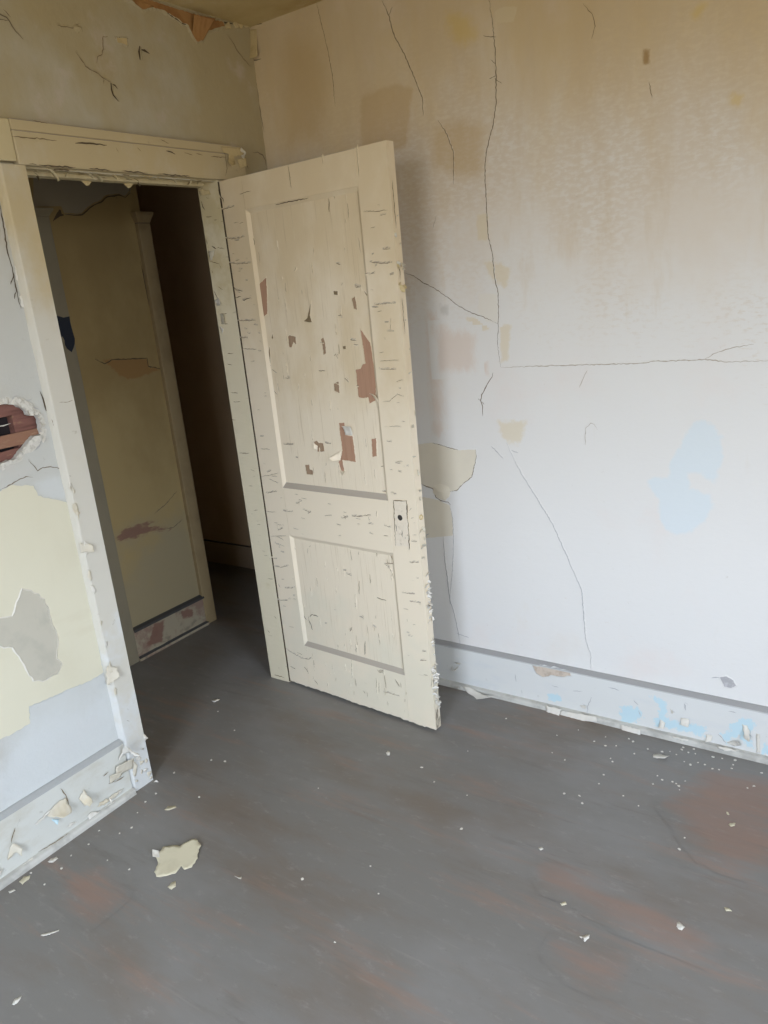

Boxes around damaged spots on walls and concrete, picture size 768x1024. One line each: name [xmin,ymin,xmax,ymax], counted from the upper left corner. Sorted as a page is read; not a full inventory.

flaking render [124,0,226,44]
crack [12,0,768,727]
flaking render [0,396,47,470]
flaking render [114,516,174,545]
peeling [0,482,158,825]
peeling [532,664,597,722]
peeling [616,691,768,756]
flaking render [718,675,738,690]